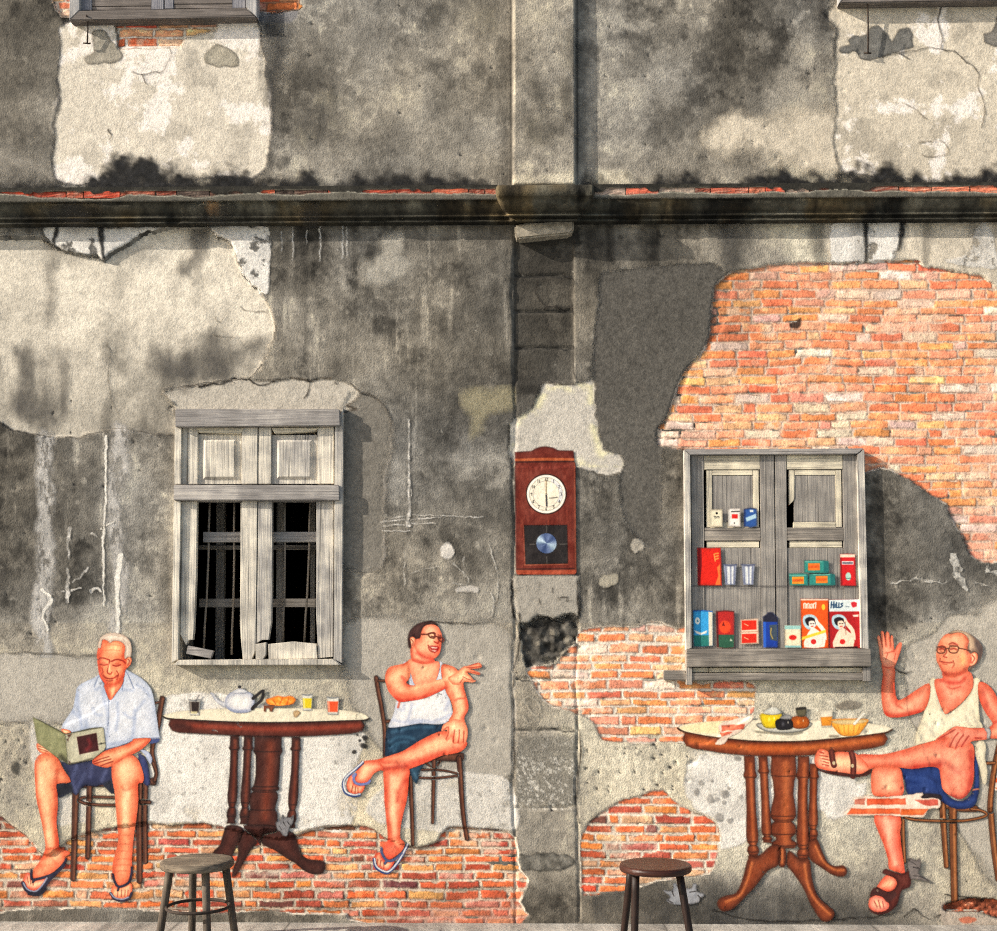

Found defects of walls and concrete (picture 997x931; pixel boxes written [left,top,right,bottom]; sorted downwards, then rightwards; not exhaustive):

peeling [52,0,302,185]
peeling [829,2,997,182]
crack [883,7,986,128]
damp [0,146,60,188]
damp [85,155,318,187]
damp [335,172,487,186]
flaking render [0,228,276,438]
flaking render [657,260,997,563]
efflorescence [100,423,130,634]
flaking render [520,599,756,744]
flaking render [0,790,721,923]